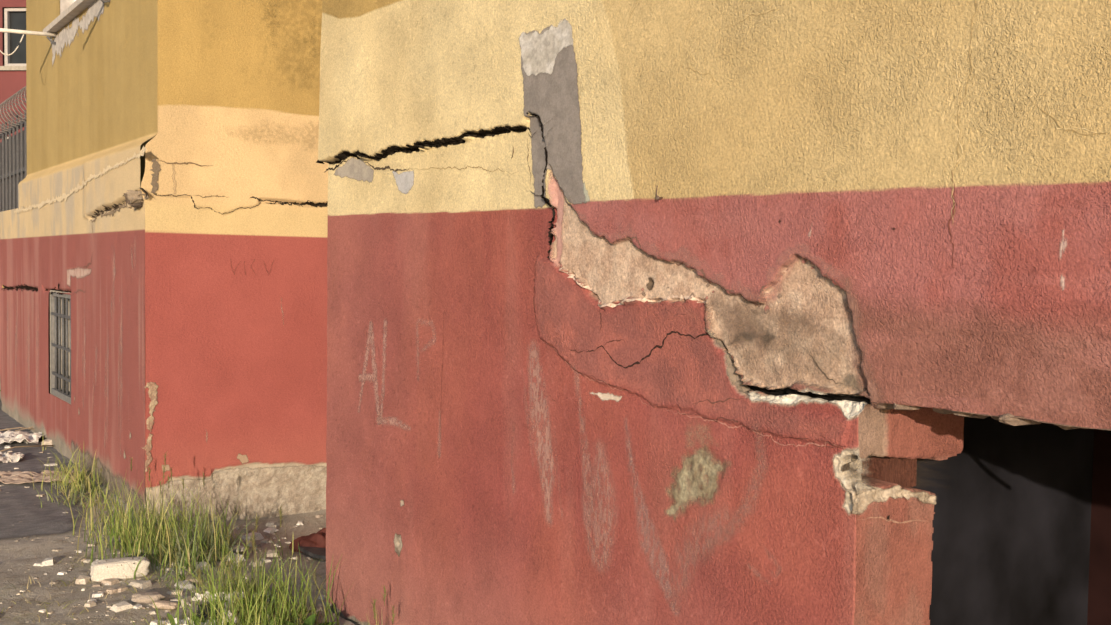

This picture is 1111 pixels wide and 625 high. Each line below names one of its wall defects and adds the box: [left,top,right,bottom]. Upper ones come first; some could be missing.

peeling [67,267,91,286]
crack [2,160,328,295]
peeling [334,157,374,182]
peeling [393,171,414,194]
crack [316,113,872,449]
flaking render [548,172,1078,430]
crack [948,0,981,269]
flaking render [143,382,327,523]
peeling [667,427,725,515]
flaking render [833,448,936,514]